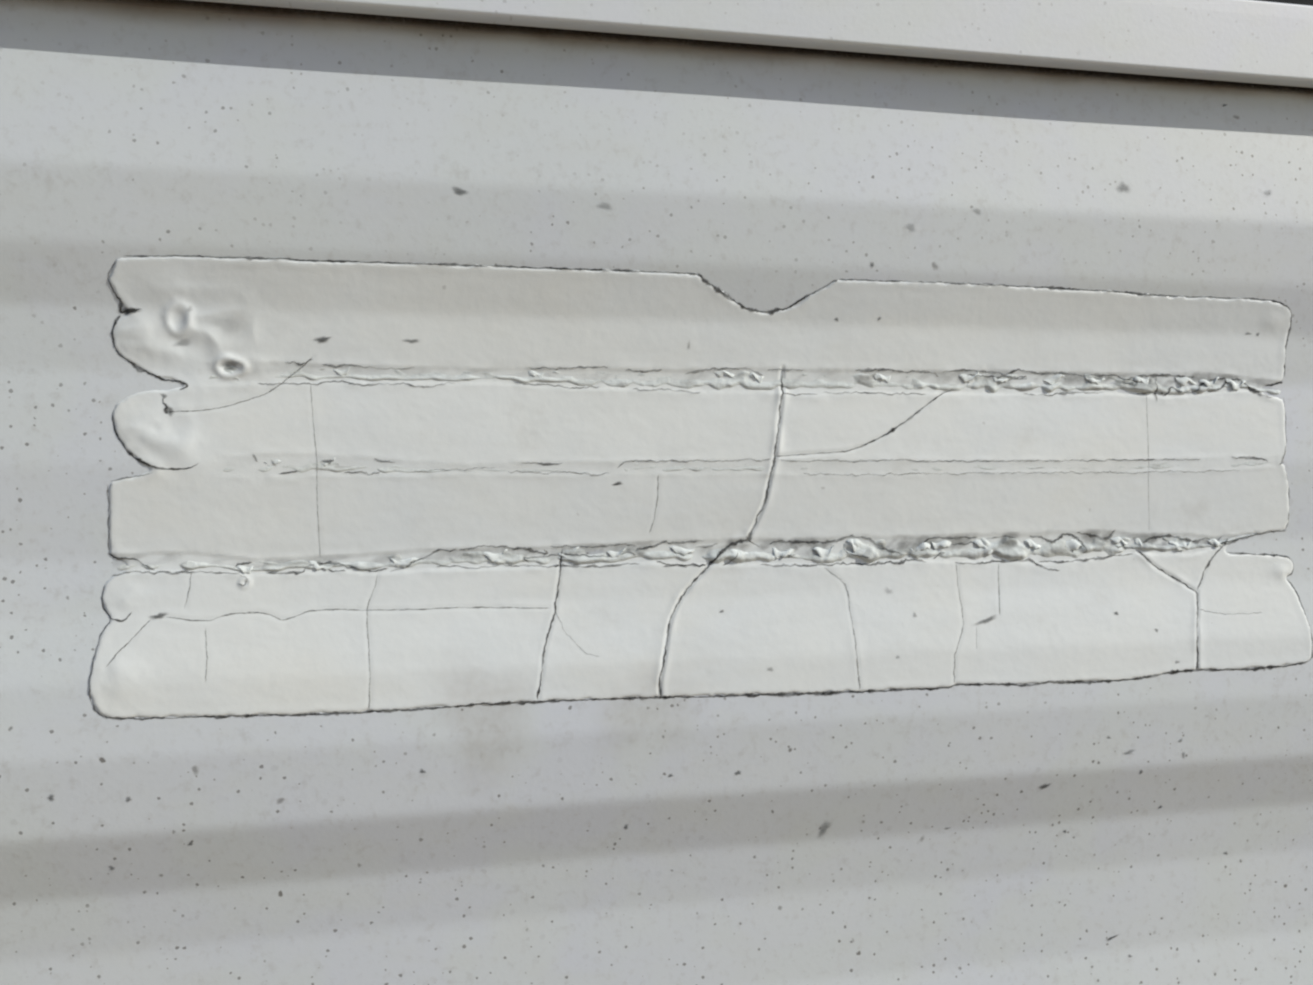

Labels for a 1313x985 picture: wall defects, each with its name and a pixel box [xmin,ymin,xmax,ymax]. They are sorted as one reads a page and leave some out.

crack [89,255,1313,720]